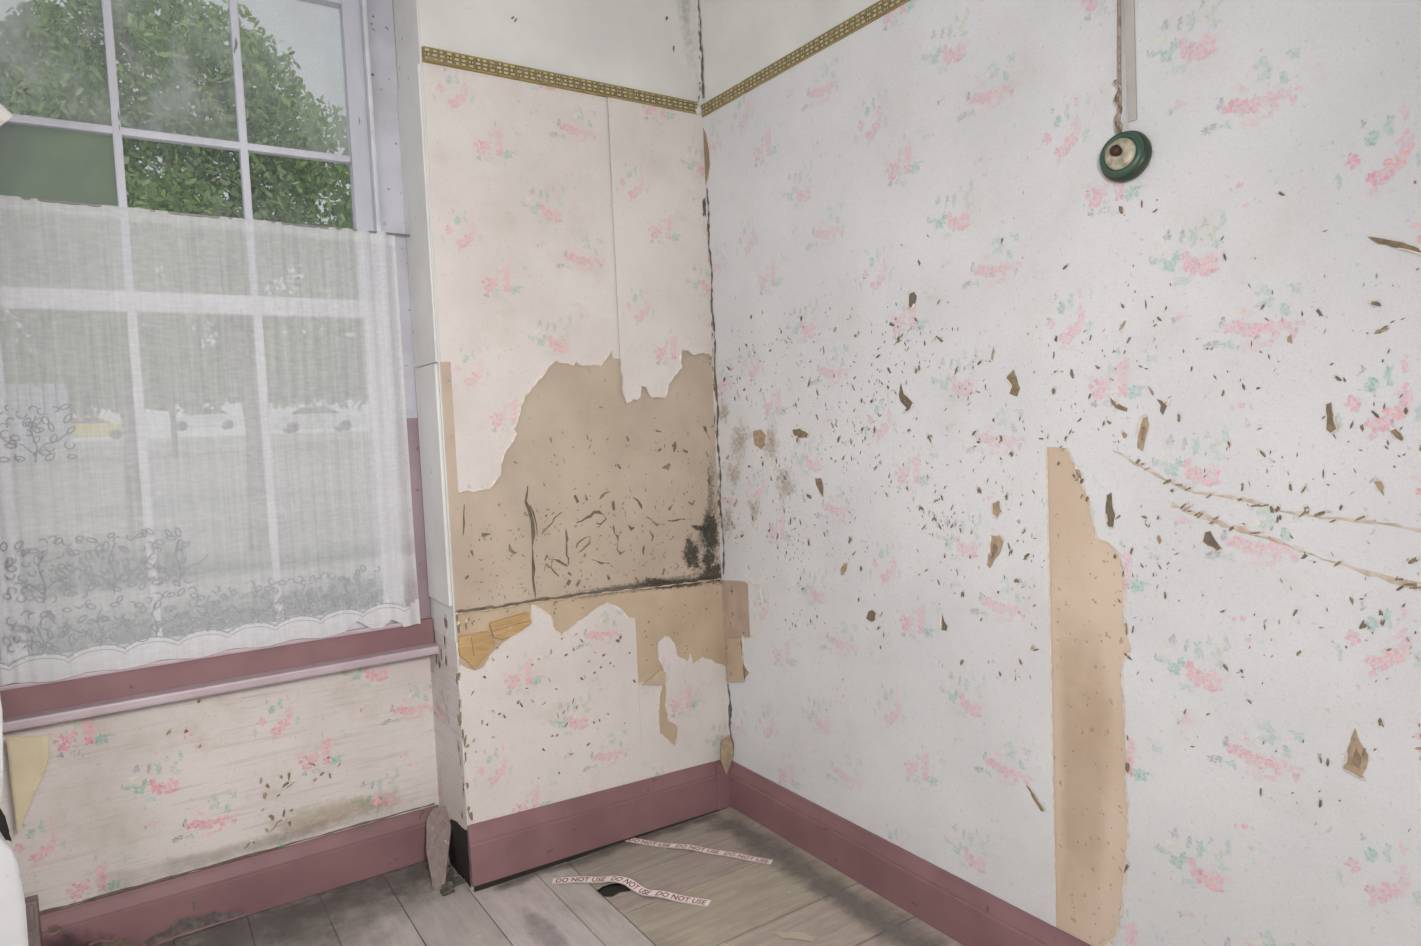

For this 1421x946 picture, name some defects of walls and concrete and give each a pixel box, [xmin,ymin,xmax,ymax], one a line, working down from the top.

spalling [1322,394,1421,468]
spalling [1257,448,1336,514]
spalling [1354,469,1384,495]
mould [642,481,722,589]
flaking render [436,180,1222,946]
spalling [1359,609,1385,641]